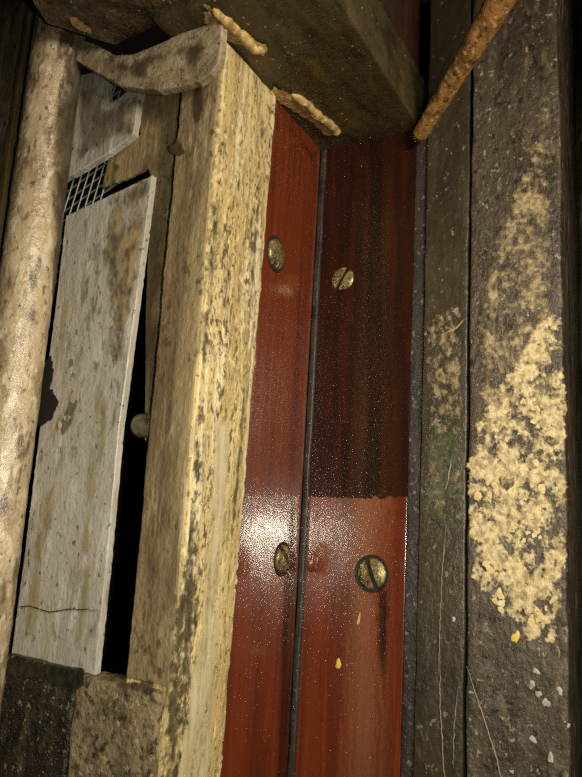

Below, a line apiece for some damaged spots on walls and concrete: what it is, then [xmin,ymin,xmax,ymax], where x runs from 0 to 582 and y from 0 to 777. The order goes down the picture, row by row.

damp [194,442,202,500]
damp [232,388,245,534]
crack [14,605,98,613]
damp [162,512,200,777]